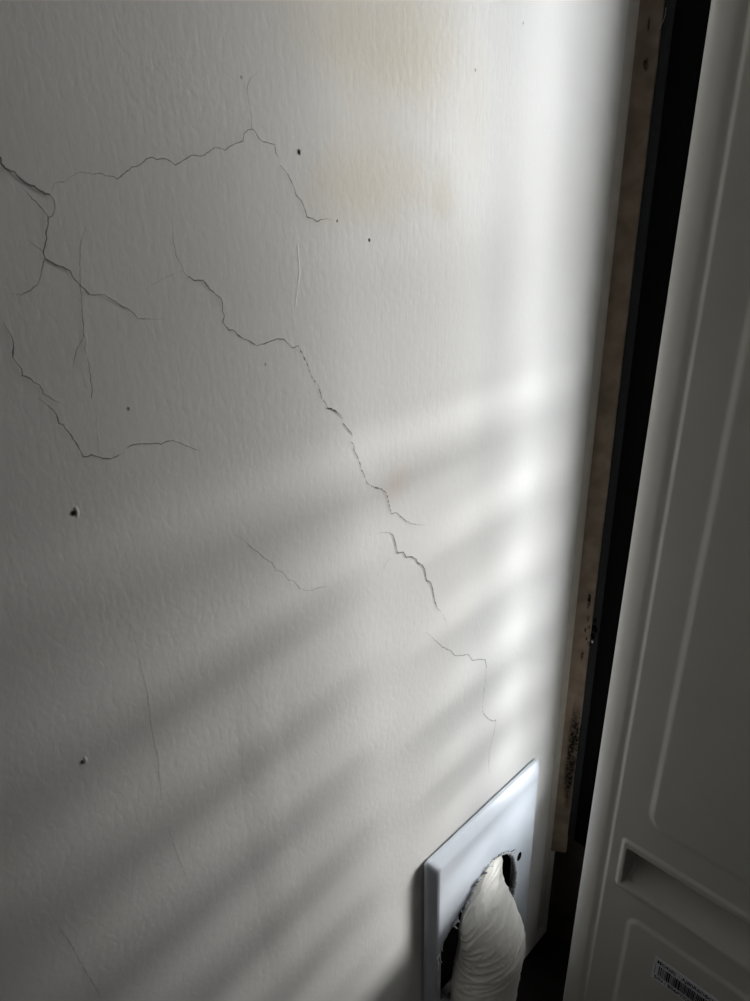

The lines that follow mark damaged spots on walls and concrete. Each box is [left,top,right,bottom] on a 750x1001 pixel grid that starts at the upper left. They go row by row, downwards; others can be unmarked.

crack [116,129,322,222]
crack [0,157,140,319]
crack [12,338,189,459]
crack [188,276,437,606]
leakage [565,712,580,801]